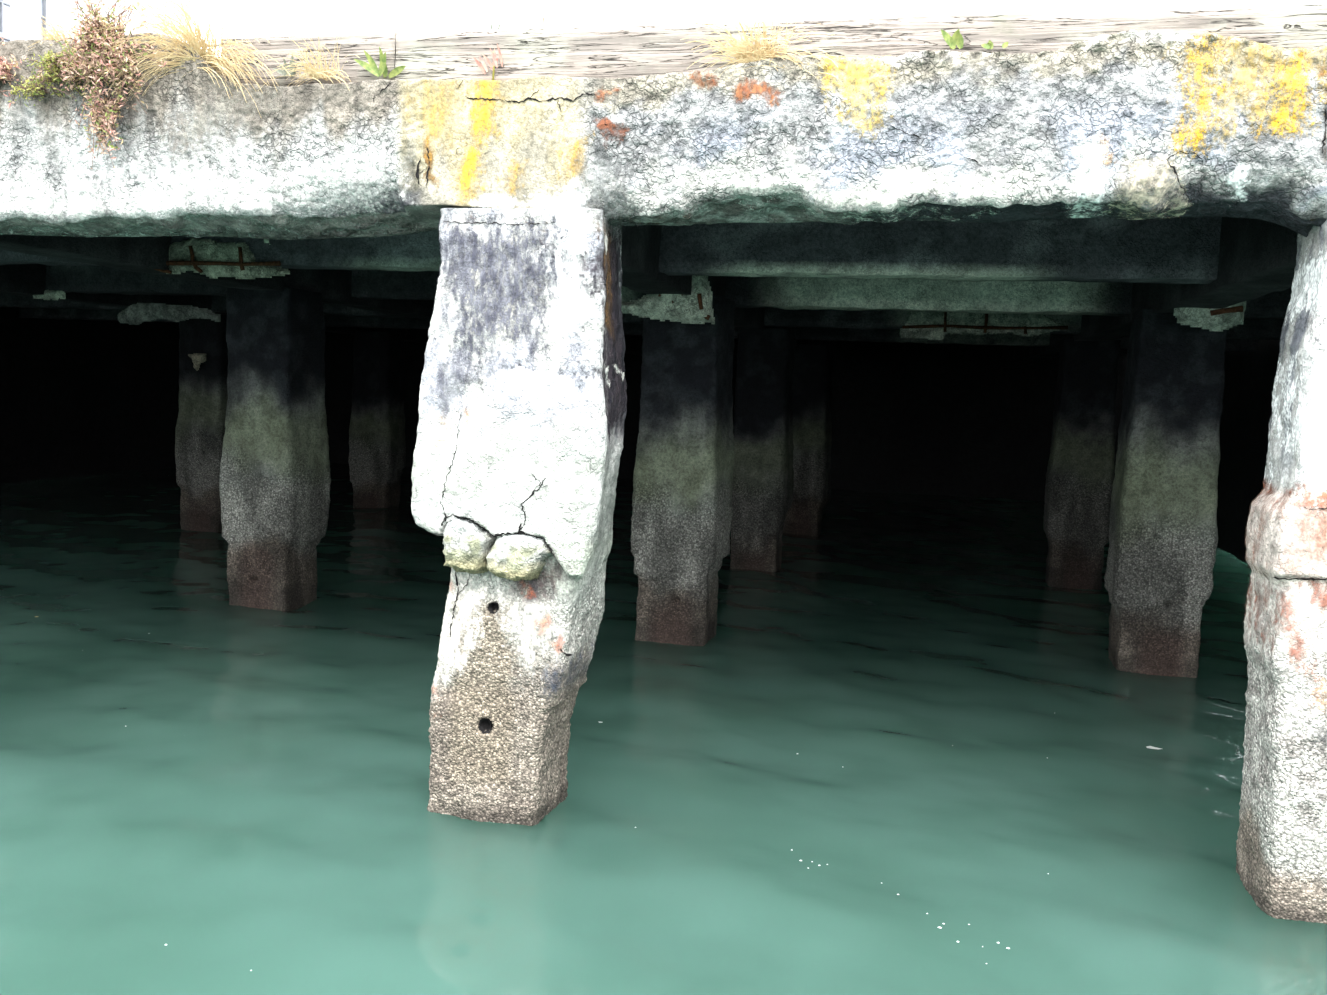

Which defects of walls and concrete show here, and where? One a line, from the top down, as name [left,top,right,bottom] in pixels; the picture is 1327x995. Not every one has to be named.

crack [1319,104,1327,153]
damp [433,143,641,440]
spalling [621,275,715,324]
damp [1264,250,1327,484]
crack [440,410,554,555]
corrosion [1245,480,1327,703]